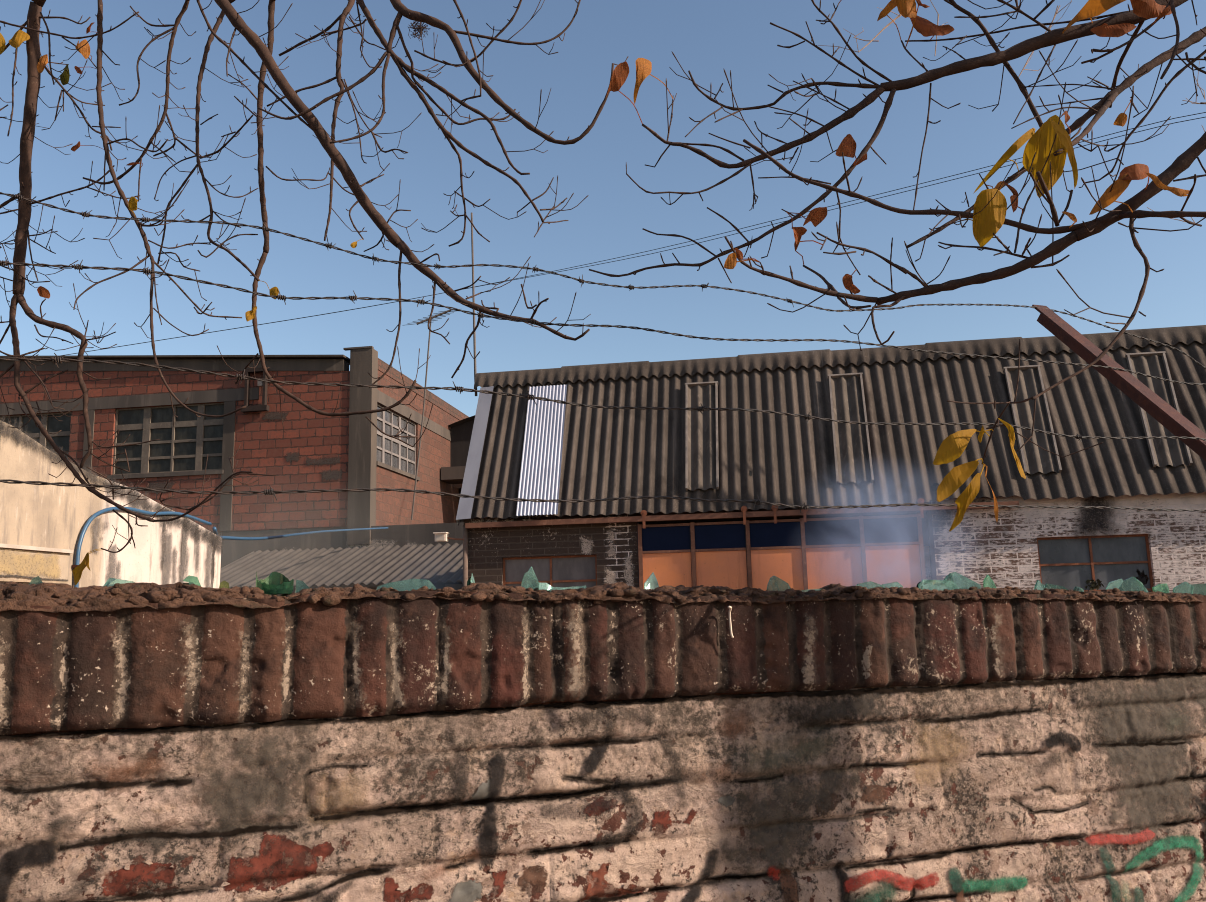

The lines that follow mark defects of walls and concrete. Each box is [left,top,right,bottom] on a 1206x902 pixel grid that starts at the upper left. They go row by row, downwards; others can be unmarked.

water stain [0,419,223,587]
water stain [1085,676,1206,842]
peeling [100,860,177,897]
peeling [221,831,334,893]
peeling [489,865,548,899]
peeling [580,863,649,902]